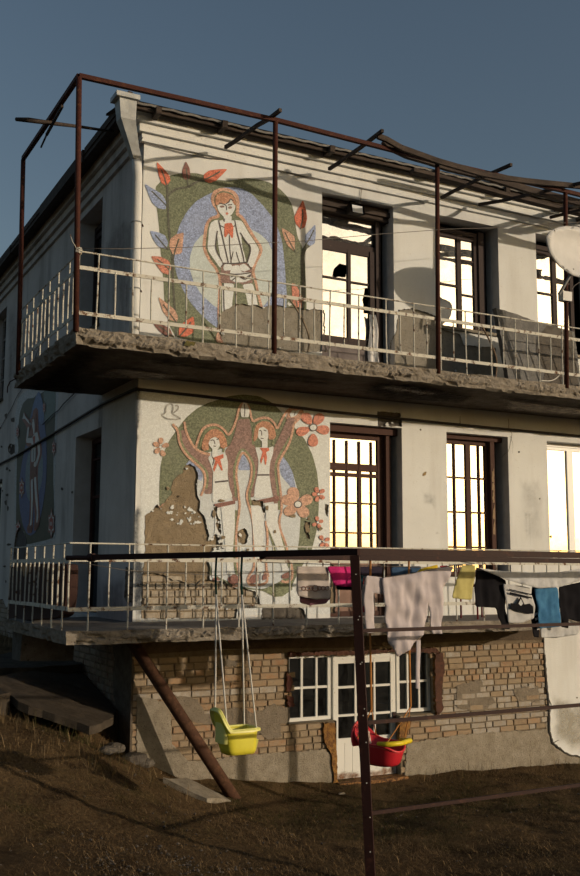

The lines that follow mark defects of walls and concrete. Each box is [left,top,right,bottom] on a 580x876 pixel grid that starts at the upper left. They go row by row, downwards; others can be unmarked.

peeling [510,402,580,414]
flaking render [3,528,27,567]
flaking render [122,464,306,641]